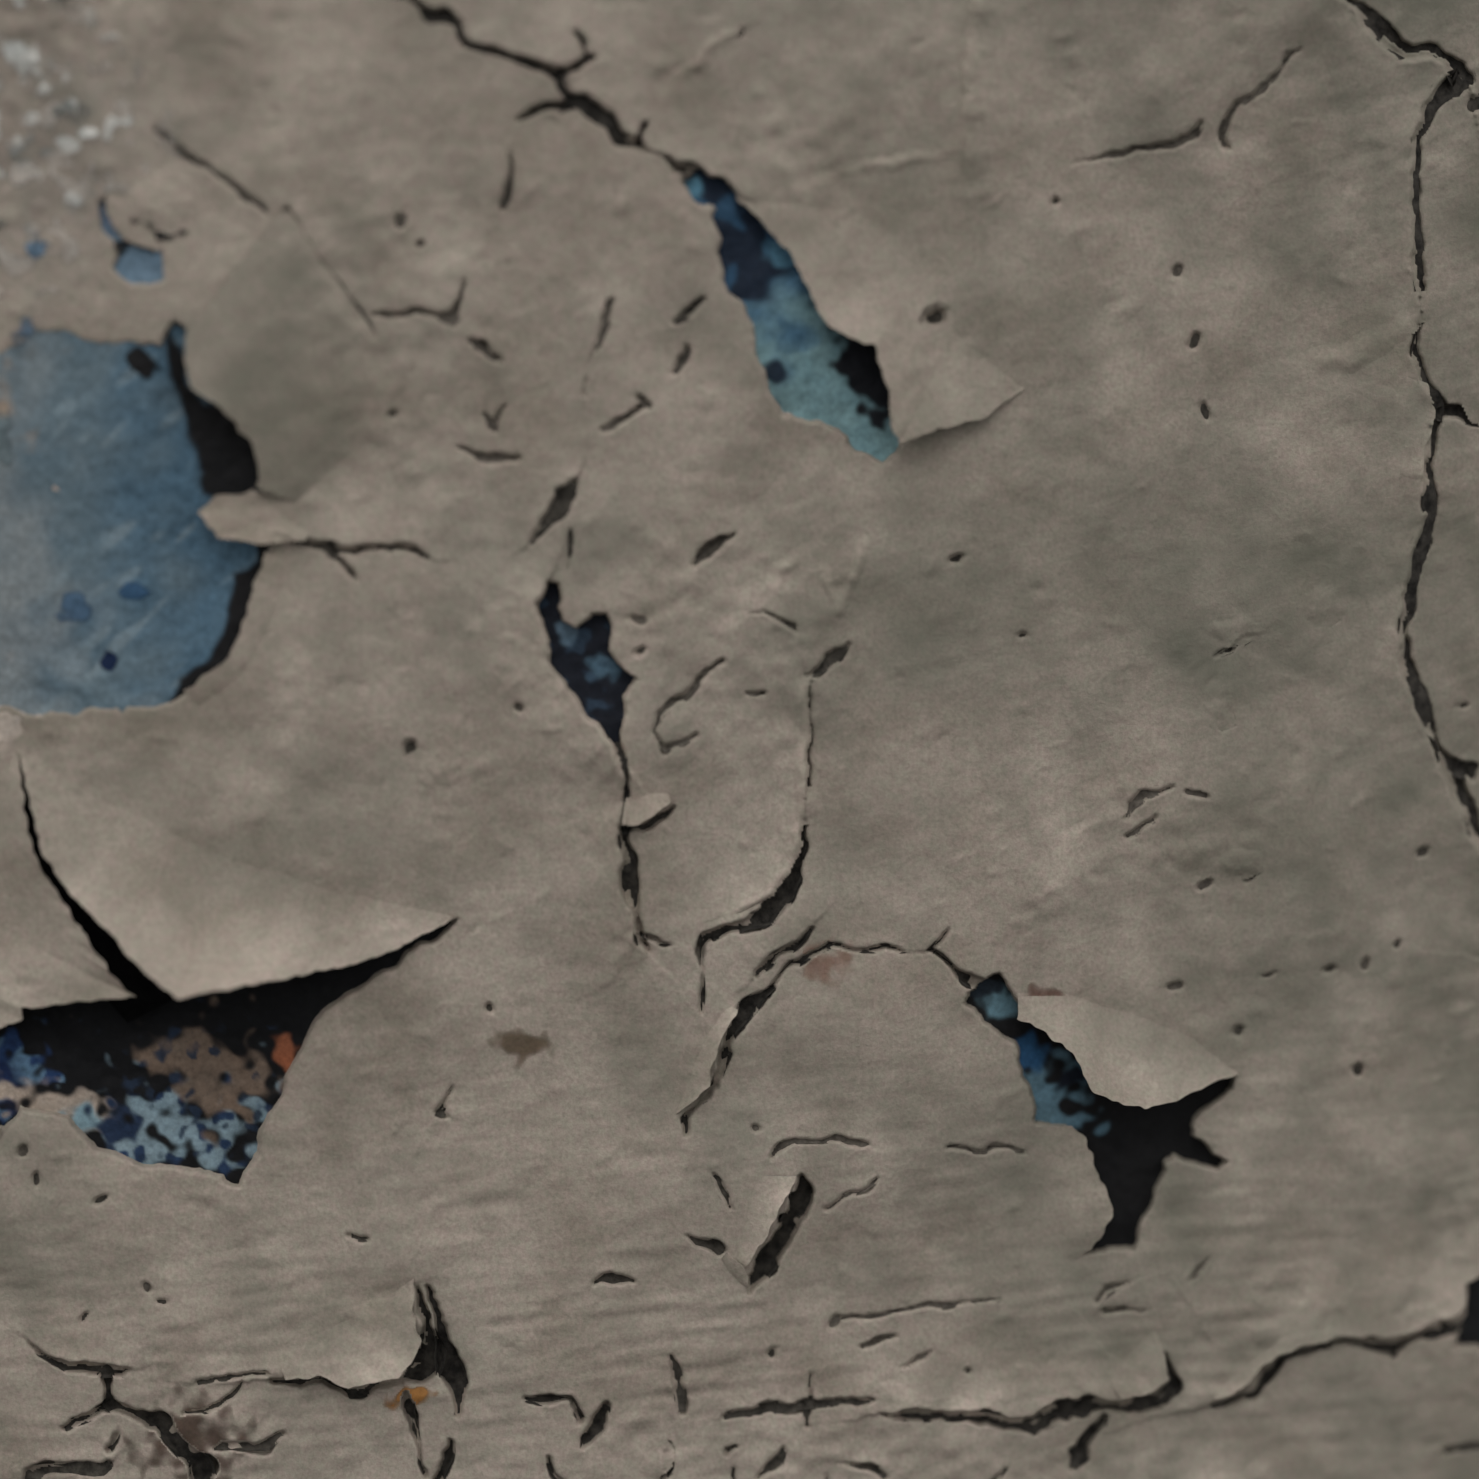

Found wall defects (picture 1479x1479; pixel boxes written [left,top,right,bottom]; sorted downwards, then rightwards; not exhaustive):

peeling [0,36,187,296]
crack [411,0,720,179]
crack [1347,0,1476,292]
peeling [684,168,1024,462]
peeling [0,210,375,715]
crack [1398,332,1479,837]
peeling [0,748,460,1184]
crack [607,645,976,1133]
peeling [966,974,1239,1260]
crack [25,1286,468,1479]
crack [724,1297,1469,1479]
peeling [1457,1278,1479,1344]